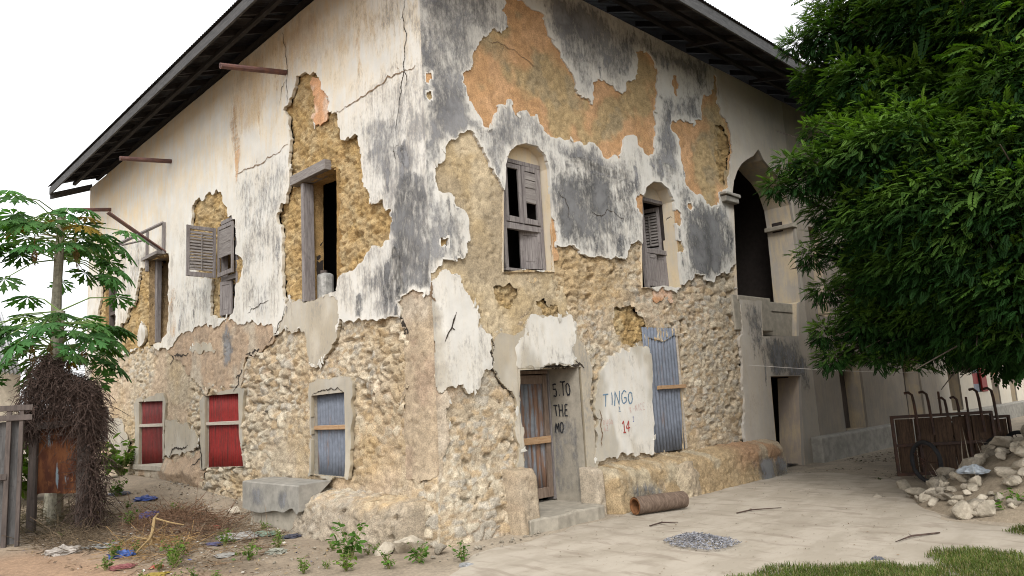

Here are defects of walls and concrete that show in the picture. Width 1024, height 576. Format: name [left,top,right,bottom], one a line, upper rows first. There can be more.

spalling [122,73,392,395]
crack [337,9,415,159]
damp [356,120,461,315]
crack [429,282,457,342]
damp [421,0,487,162]
spalling [422,131,656,468]
flaking render [463,0,658,159]
damp [552,145,639,257]
damp [652,97,699,179]
flaking render [670,73,732,226]
damp [679,191,733,276]
flaking render [108,415,130,460]